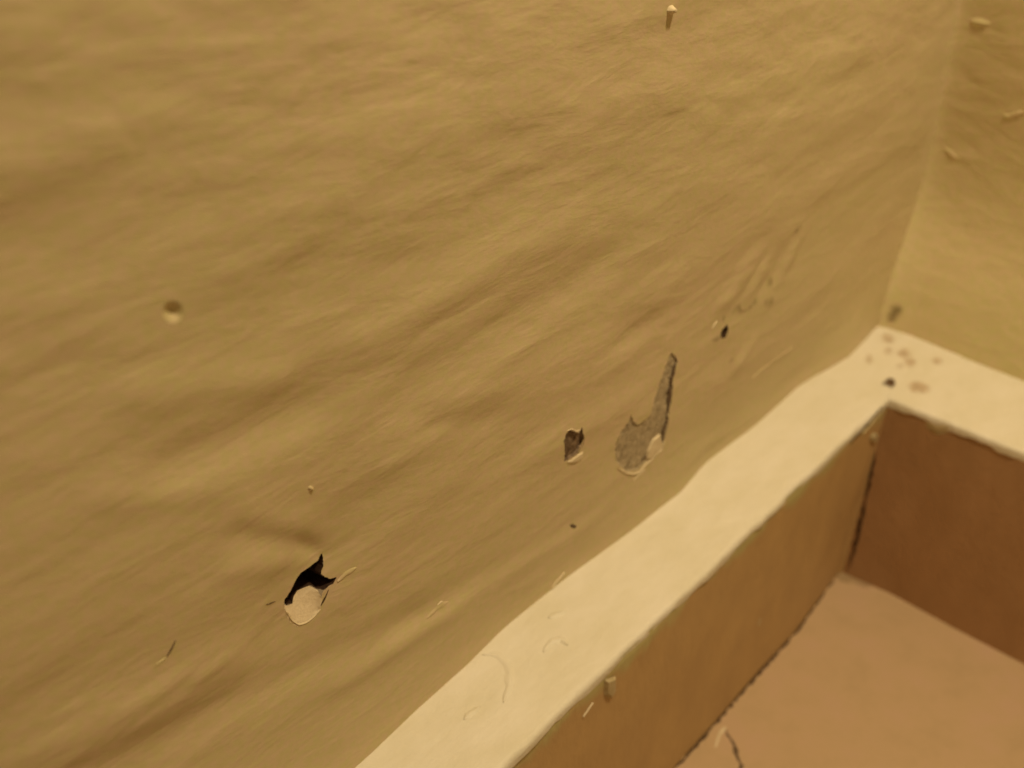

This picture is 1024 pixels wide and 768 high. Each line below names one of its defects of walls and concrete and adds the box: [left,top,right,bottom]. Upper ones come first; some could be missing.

spalling [564,428,584,463]
peeling [615,353,678,480]
spalling [266,554,356,627]
crack [674,407,883,768]